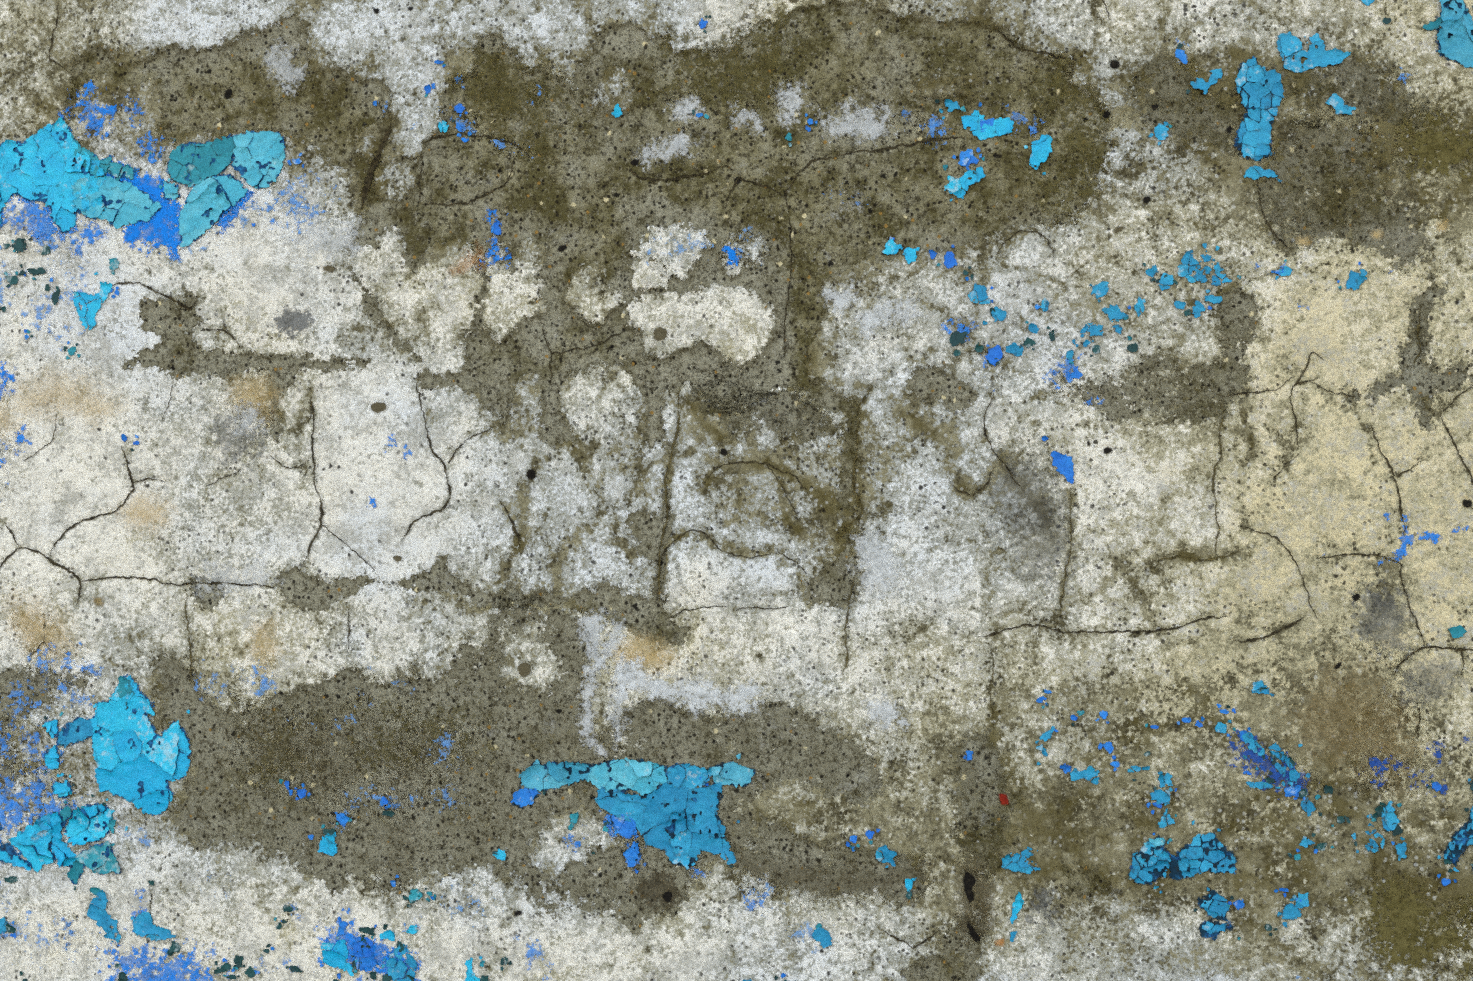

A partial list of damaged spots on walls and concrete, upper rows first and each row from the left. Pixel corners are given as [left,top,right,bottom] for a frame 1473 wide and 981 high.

water stain [639,97,704,166]
water stain [778,84,892,143]
water stain [272,304,315,338]
spalling [0,0,1473,613]
crack [0,396,375,680]
crack [402,383,499,539]
crack [974,352,1473,733]
spalling [0,489,928,981]
water stain [578,608,767,757]
peeling [1035,710,1245,941]
peeling [1177,704,1448,861]
peeling [1437,778,1473,886]